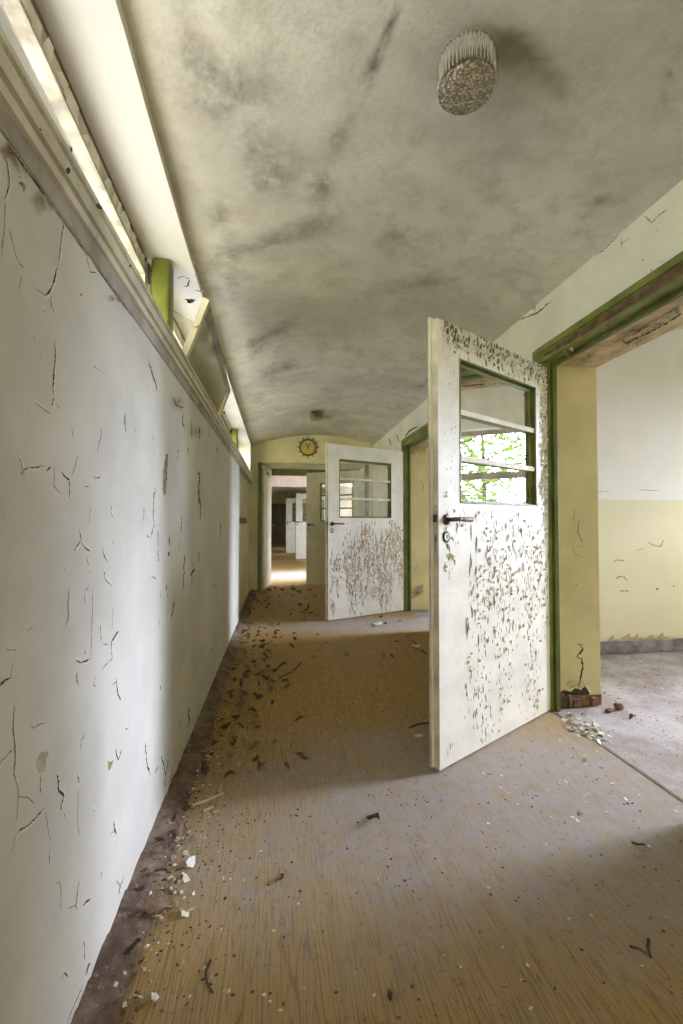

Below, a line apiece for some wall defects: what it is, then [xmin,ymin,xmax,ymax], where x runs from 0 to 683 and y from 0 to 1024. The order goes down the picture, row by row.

crack [1,142,132,413]
crack [176,266,205,296]
crack [519,299,553,320]
crack [18,414,137,700]
crack [142,358,225,626]
peeling [330,521,424,618]
peeling [441,320,550,744]
crack [613,539,664,592]
crack [566,642,584,688]
crack [0,627,124,910]
crack [115,725,173,785]
crack [61,943,91,1024]